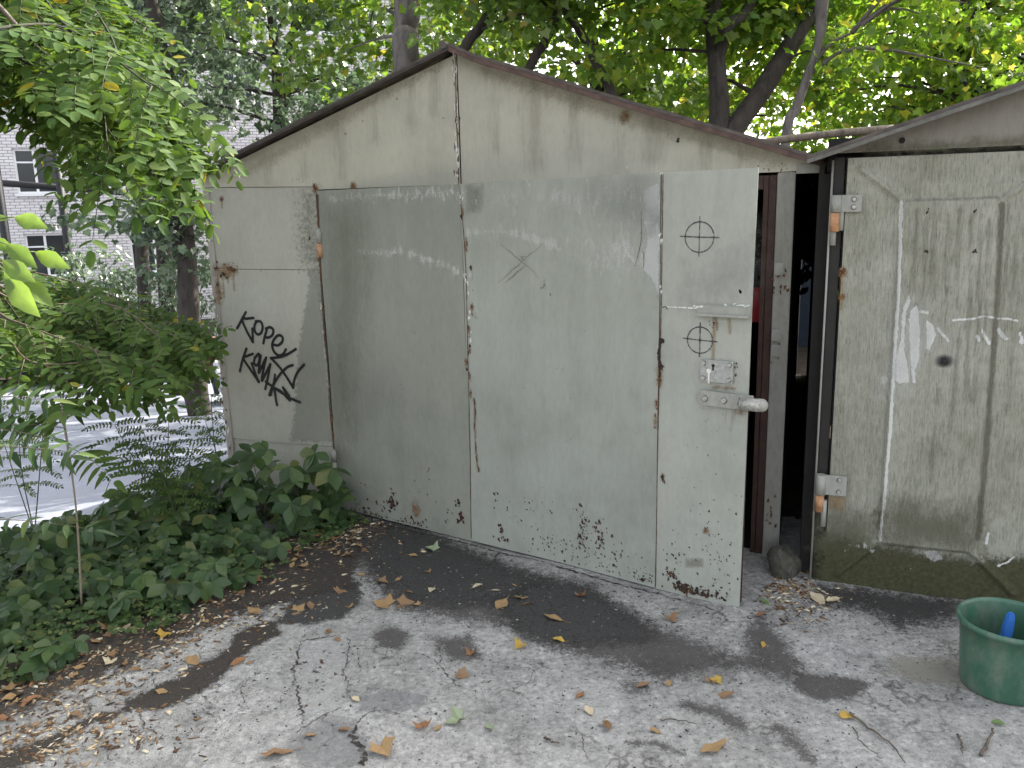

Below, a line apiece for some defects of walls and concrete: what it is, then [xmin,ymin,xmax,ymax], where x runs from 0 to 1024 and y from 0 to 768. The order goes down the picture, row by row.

rust [213,261,238,300]
rust [460,195,479,514]
rust [654,378,665,483]
crack [0,509,713,768]